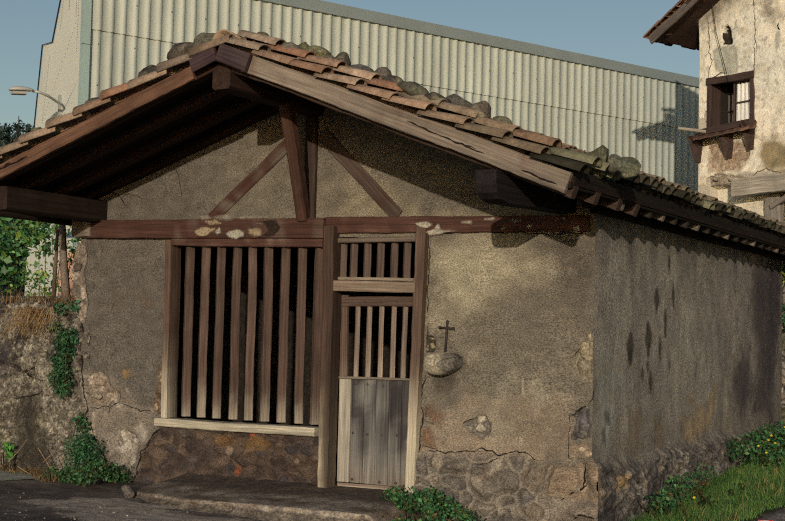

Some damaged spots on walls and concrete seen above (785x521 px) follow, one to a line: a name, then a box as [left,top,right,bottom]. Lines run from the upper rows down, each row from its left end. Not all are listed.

crack [708,23,726,78]
flaking render [708,143,750,187]
peeling [195,215,280,239]
peeling [416,222,449,235]
leakage [641,287,674,392]
flaking render [88,372,121,406]
crack [80,323,150,463]
flaking render [107,429,141,473]
crack [128,428,161,480]
flaking render [463,415,492,440]
crack [419,374,537,465]
flaking render [570,406,592,458]